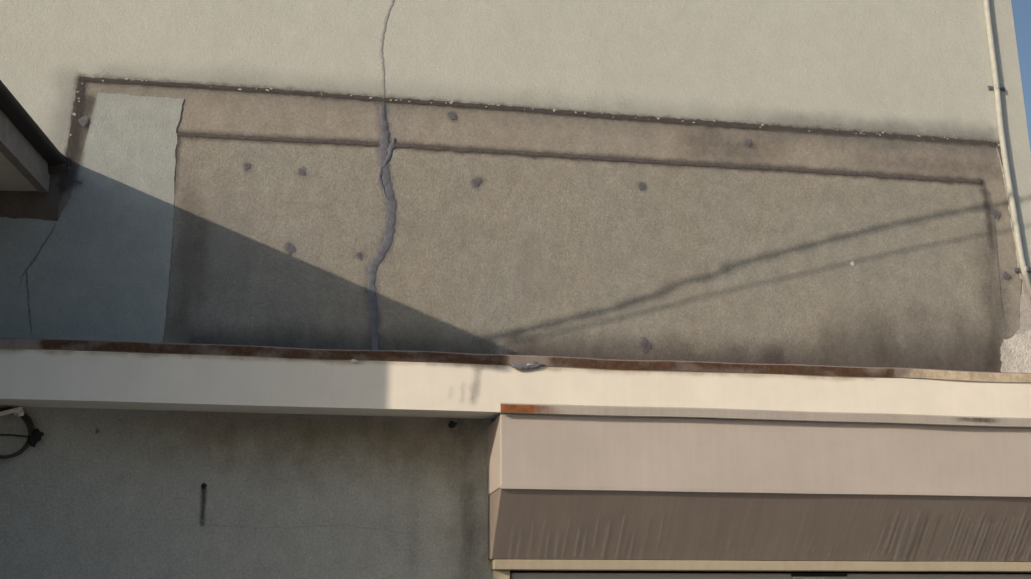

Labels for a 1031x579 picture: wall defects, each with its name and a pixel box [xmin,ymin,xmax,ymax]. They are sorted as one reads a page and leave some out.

crack [175,0,992,350]
crack [19,222,57,334]
corrosion [41,340,507,365]
corrosion [550,357,893,377]
damp [517,347,992,372]
corrosion [501,404,544,413]